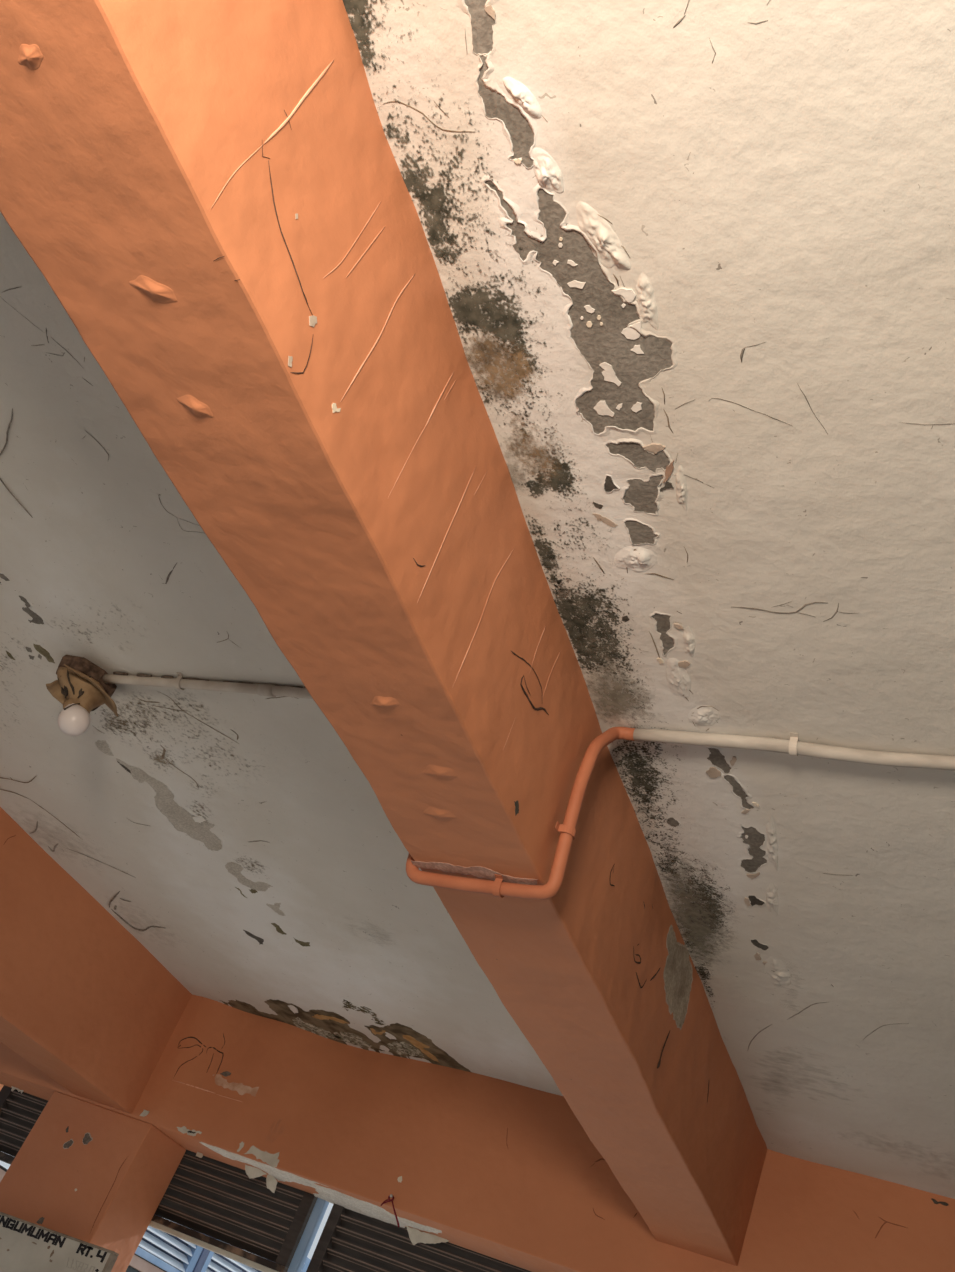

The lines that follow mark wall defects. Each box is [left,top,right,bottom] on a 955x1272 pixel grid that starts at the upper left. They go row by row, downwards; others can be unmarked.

water stain [342,0,411,72]
peeling [456,0,538,169]
peeling [479,174,678,545]
water stain [374,81,733,1007]
peeling [704,746,769,879]
peeling [663,925,693,1030]
peeling [744,895,766,907]
peeling [750,939,769,965]
peeling [177,1126,442,1234]